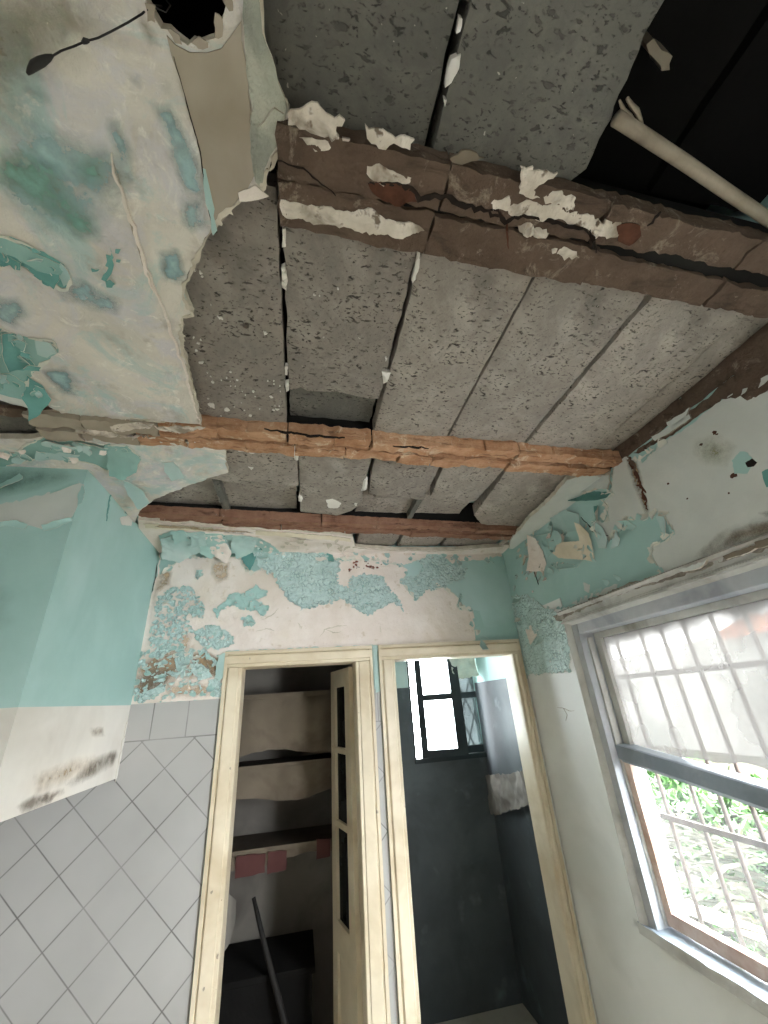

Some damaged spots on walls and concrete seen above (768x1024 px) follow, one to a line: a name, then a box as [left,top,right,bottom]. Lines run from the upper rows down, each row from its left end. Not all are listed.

leakage [4,138,116,233]
crack [277,160,336,196]
crack [368,181,661,253]
peeling [491,165,621,261]
peeling [0,0,504,704]
crack [264,428,345,439]
crack [393,443,429,451]
peeling [512,323,768,621]
leakage [86,754,115,775]